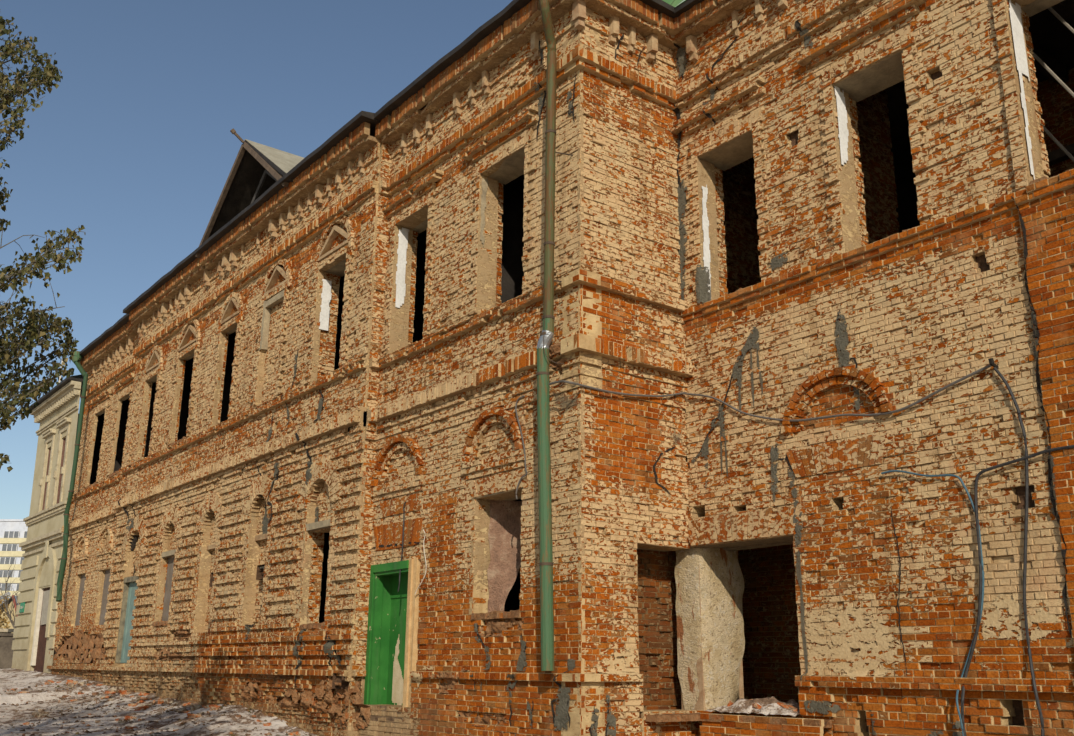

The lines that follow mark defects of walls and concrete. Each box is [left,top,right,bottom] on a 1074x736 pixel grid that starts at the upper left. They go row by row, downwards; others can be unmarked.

peeling [835,86,849,165]
peeling [1009,0,1035,179]
peeling [319,279,332,331]
peeling [395,228,409,308]
peeling [702,185,711,302]
spalling [975,255,990,272]
crack [653,326,763,495]
crack [1011,196,1072,637]
crack [245,350,324,640]
spalling [392,638,507,727]
peeling [804,605,904,683]
peeling [981,594,1059,643]